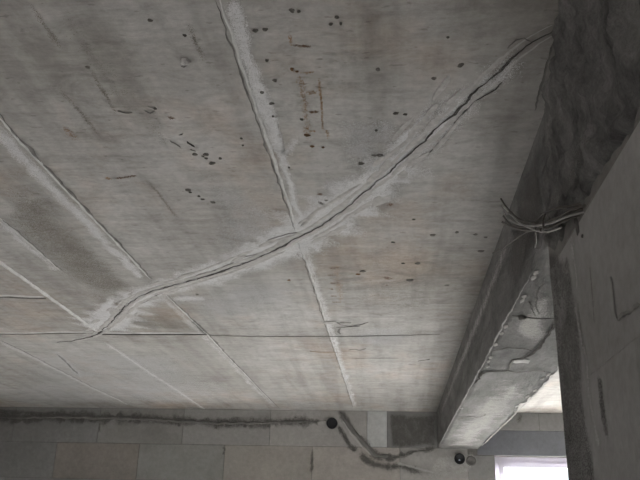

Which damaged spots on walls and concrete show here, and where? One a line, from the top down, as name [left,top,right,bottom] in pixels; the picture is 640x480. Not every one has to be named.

leakage [0,0,524,409]
crack [51,25,555,384]
spalling [439,267,540,446]